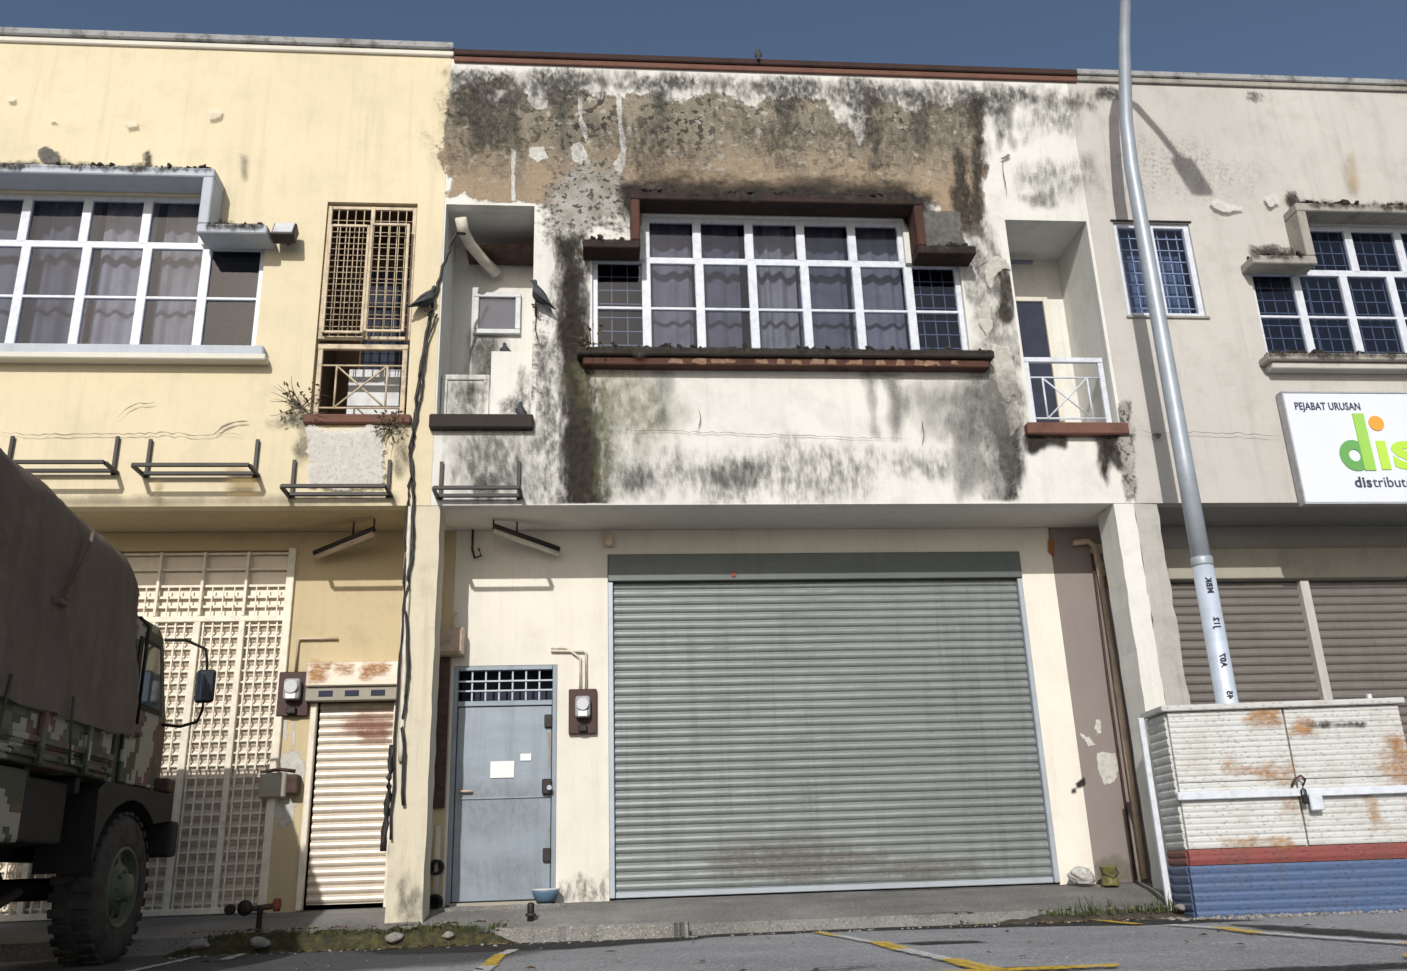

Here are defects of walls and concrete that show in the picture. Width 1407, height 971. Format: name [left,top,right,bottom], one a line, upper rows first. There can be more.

leakage [447,68,1119,364]
peeling [436,76,1020,436]
leakage [451,232,868,503]
crack [3,402,248,436]
leakage [864,371,900,426]
leakage [894,373,1068,500]
leakage [1096,436,1124,479]
corrosion [310,661,390,681]
corrosion [1249,709,1365,733]
peeling [1080,719,1119,785]
corrosion [1381,737,1407,783]